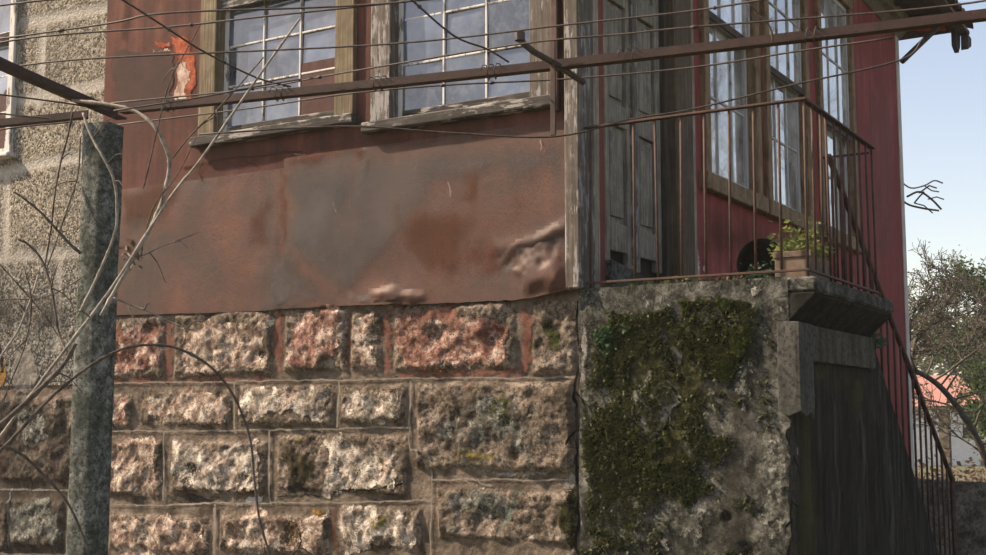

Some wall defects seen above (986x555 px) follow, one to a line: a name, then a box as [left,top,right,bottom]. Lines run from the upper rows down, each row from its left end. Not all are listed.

peeling [153,36,196,100]
crack [565,301,586,555]